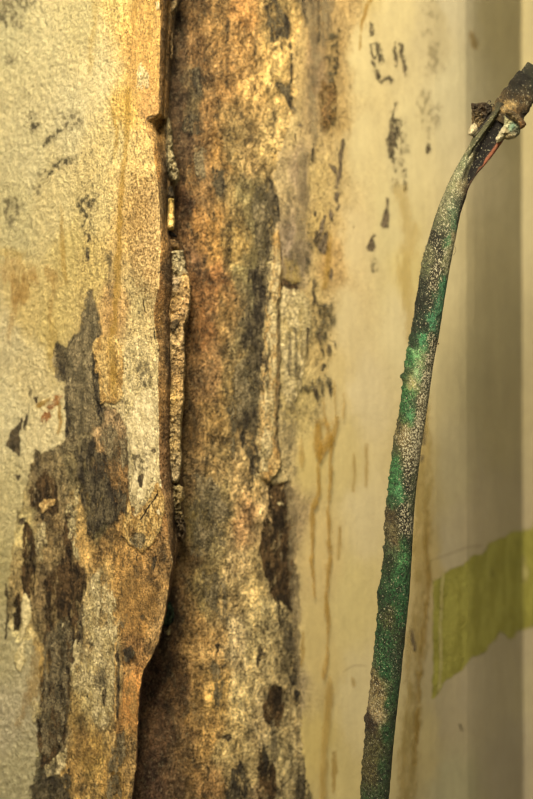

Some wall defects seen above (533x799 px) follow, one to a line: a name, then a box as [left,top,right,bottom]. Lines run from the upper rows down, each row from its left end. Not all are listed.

leakage [265,0,296,112]
mould [369,21,407,84]
mould [32,155,78,195]
mould [42,111,82,147]
leakage [193,147,227,198]
leakage [380,102,409,228]
leakage [123,171,160,316]
leakage [227,28,345,491]
leakage [74,336,160,540]
spalling [4,0,312,799]
leakage [256,482,302,799]
leakage [296,774,313,799]